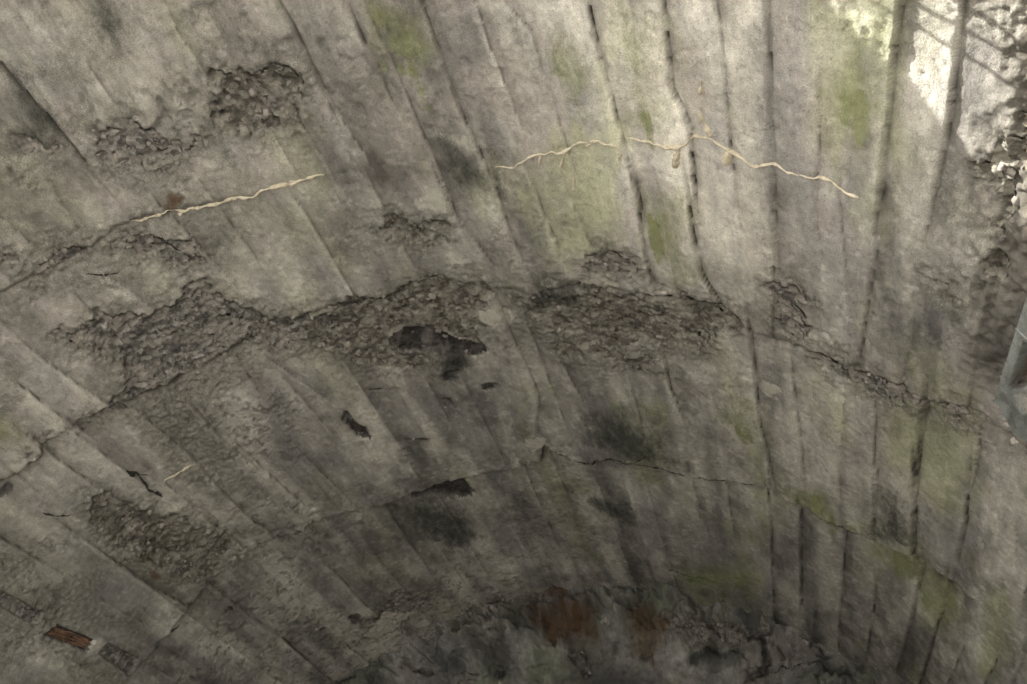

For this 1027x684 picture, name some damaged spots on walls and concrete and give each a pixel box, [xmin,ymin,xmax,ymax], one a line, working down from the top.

spalling [209,63,304,139]
spalling [92,119,205,177]
spalling [969,112,1027,281]
spalling [108,232,207,269]
spalling [376,213,450,247]
spalling [512,250,742,374]
spalling [49,274,494,414]
spalling [342,411,372,440]
spalling [403,478,476,500]
crack [558,454,754,485]
spalling [90,491,230,581]